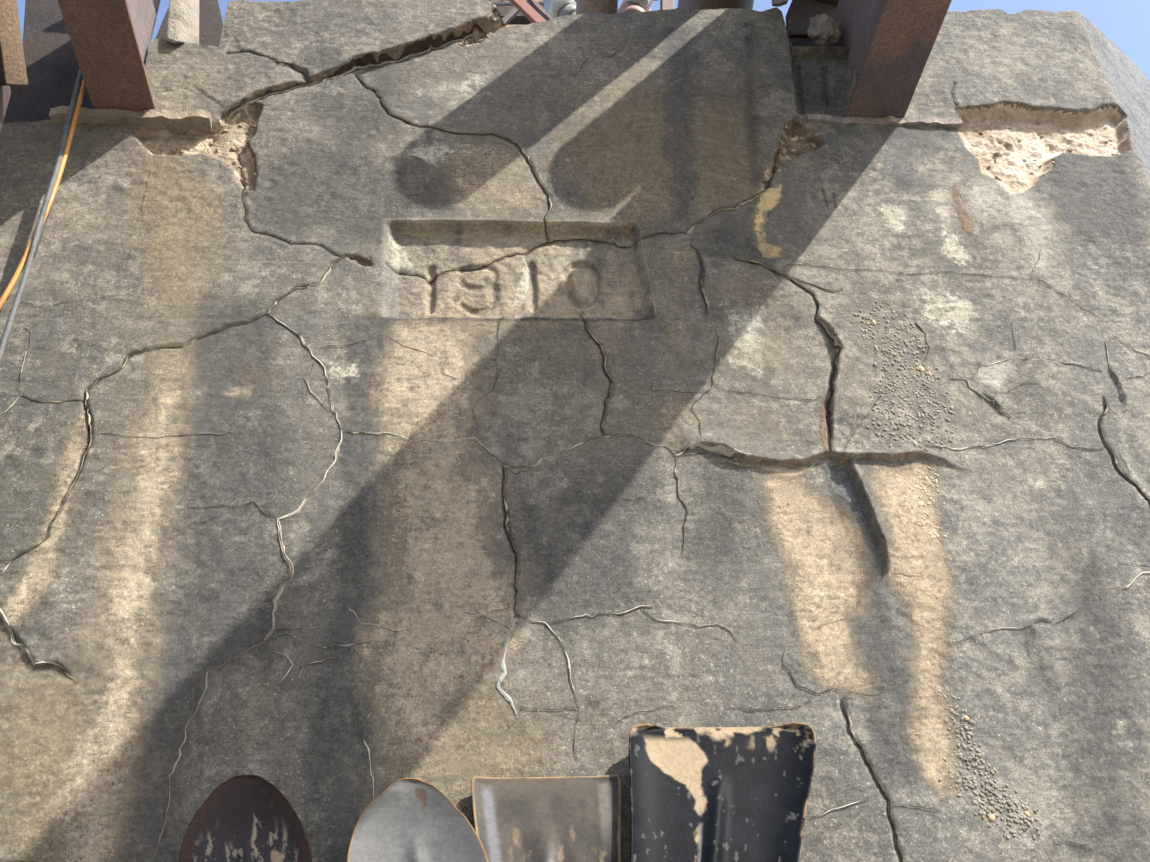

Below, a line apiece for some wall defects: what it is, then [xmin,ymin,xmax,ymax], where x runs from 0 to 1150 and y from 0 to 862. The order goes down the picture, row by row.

spalling [133,104,262,191]
crack [222,23,781,328]
spalling [753,119,824,258]
spalling [957,102,1131,194]
crack [980,249,1100,318]
crack [865,293,1150,502]
crack [0,151,966,862]
water stain [761,477,870,698]
water stain [873,461,958,795]
crack [956,610,1078,643]
crack [1117,562,1150,594]